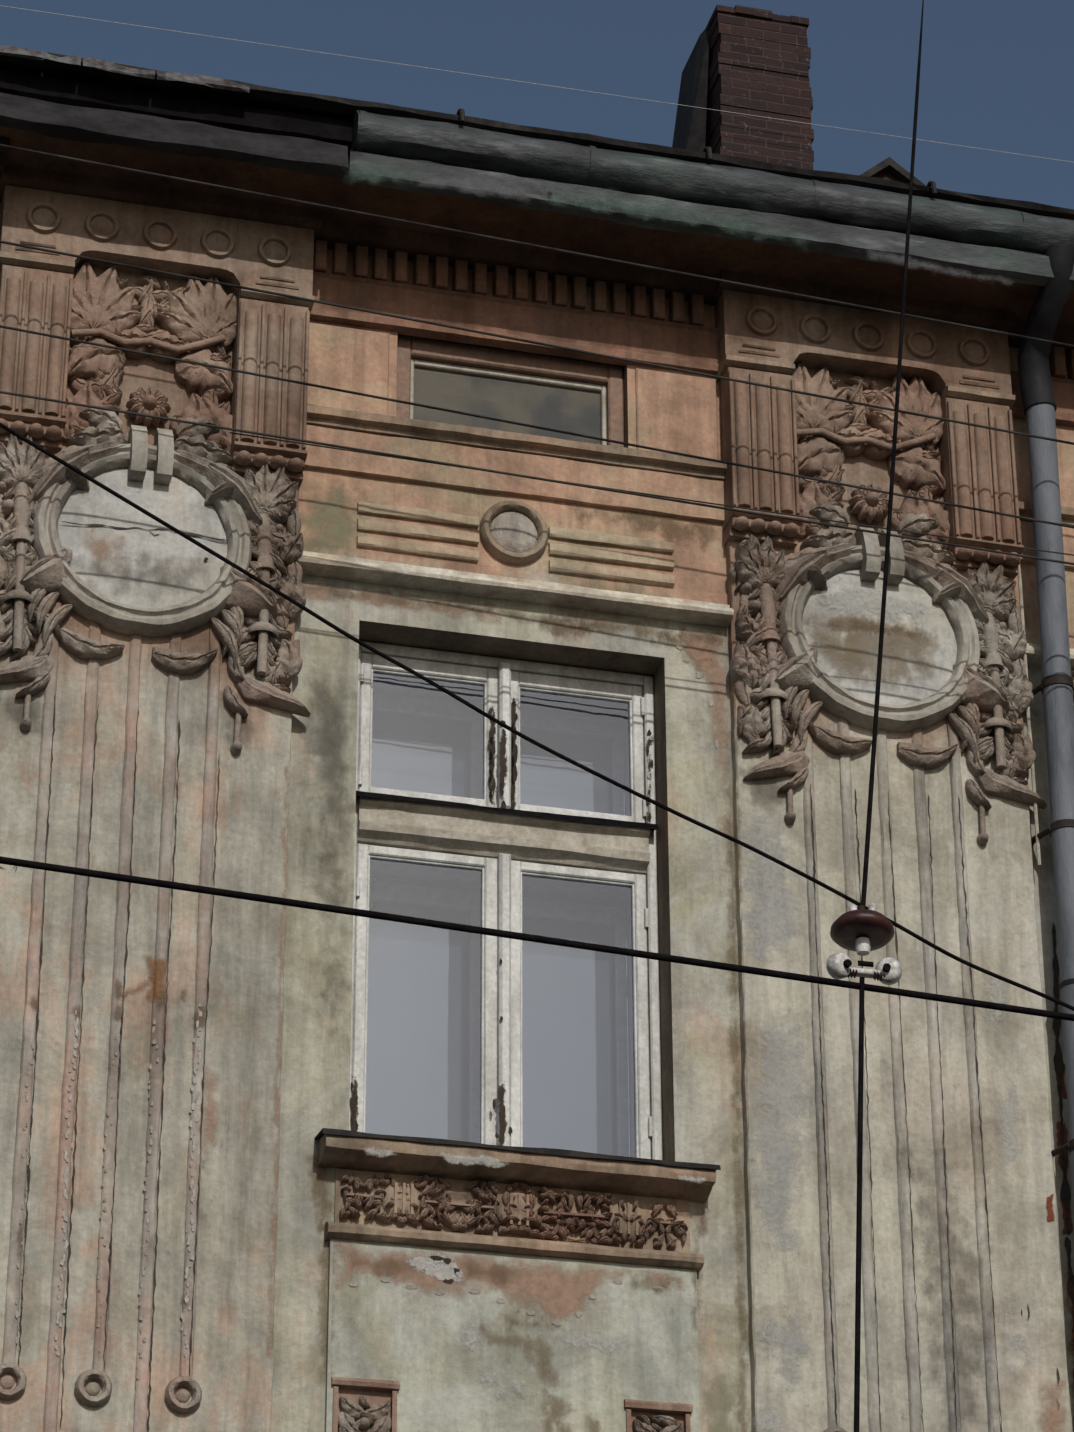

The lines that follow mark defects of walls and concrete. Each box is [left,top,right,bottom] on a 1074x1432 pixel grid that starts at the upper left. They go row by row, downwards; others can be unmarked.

crack [59,521,227,541]
damp [814,618,932,679]
peeling [487,698,518,809]
spalling [444,1081,513,1167]
peeling [343,1247,622,1318]